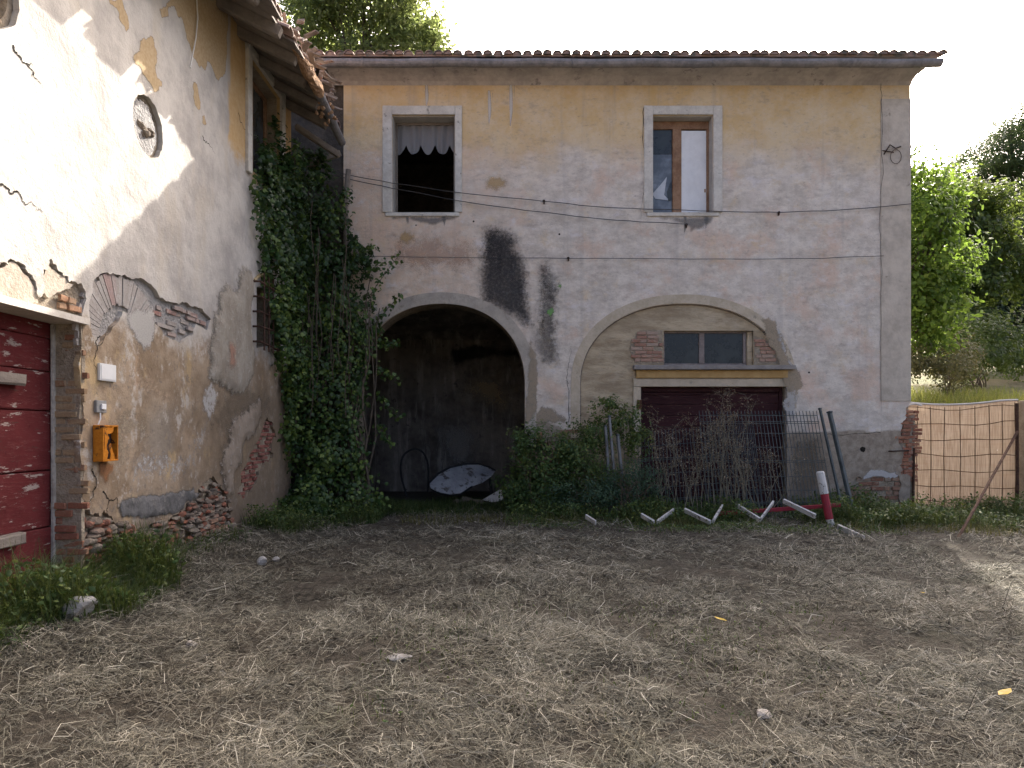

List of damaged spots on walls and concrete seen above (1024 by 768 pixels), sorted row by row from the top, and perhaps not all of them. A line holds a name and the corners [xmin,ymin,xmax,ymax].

crack [13,45,43,87]
peeling [134,36,162,92]
peeling [160,0,228,80]
crack [0,183,42,211]
leakage [481,228,533,325]
flaking render [0,261,208,572]
flaking render [237,420,275,499]
spalling [850,406,913,504]